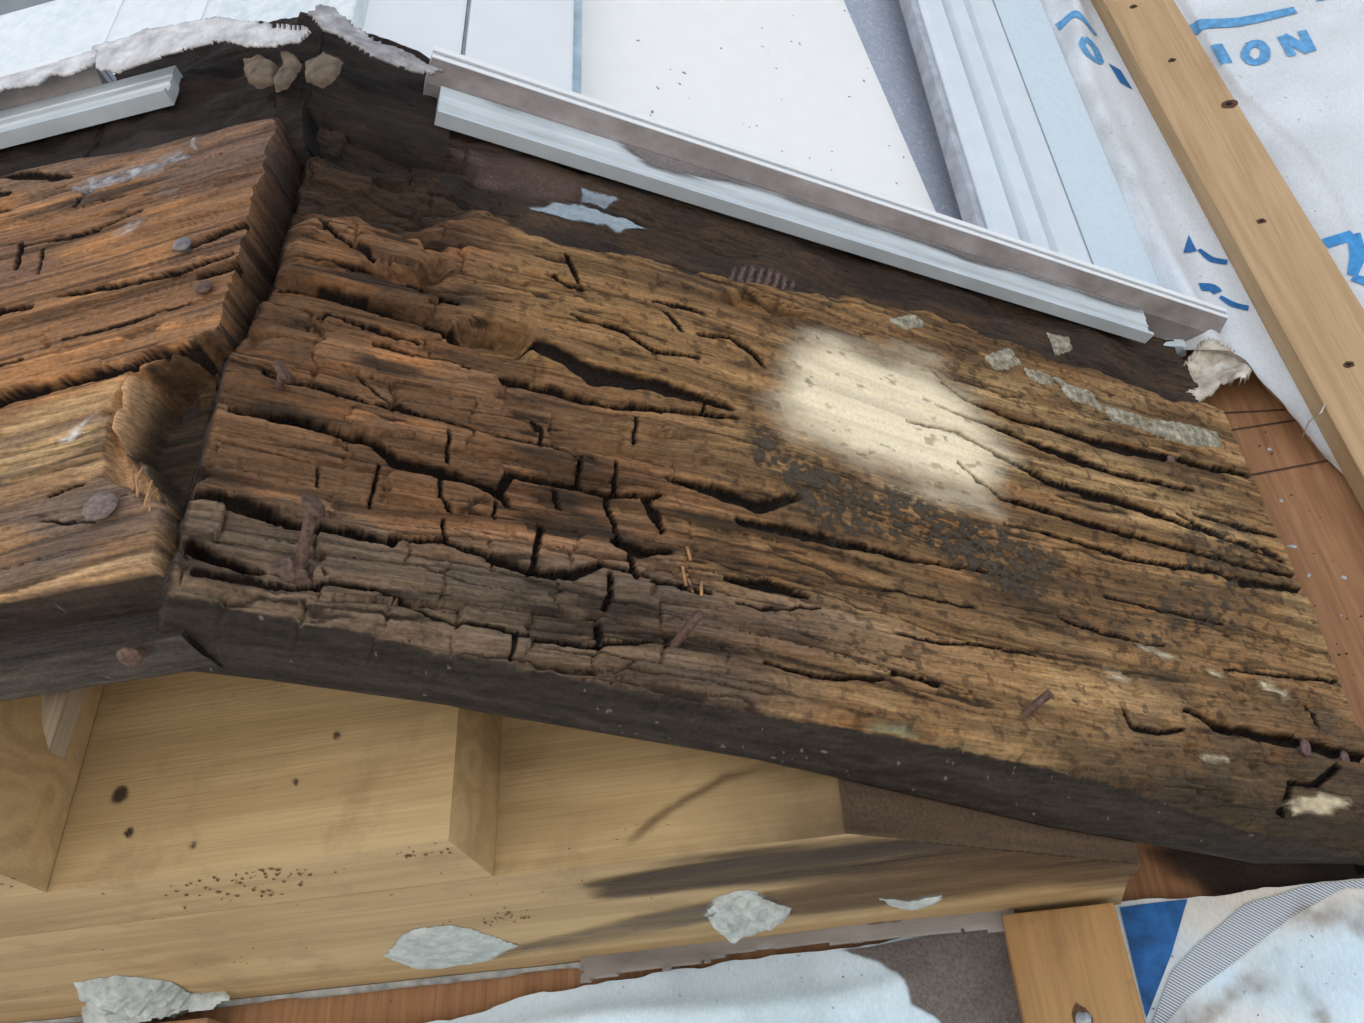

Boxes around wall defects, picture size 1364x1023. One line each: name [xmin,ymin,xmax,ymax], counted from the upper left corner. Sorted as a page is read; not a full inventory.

crack [0,172,142,274]
crack [62,223,249,341]
crack [0,345,219,409]
crack [183,224,985,662]
crack [915,405,1300,593]
crack [763,662,939,688]
crack [897,634,1035,657]
crack [1059,595,1223,647]
crack [1122,669,1364,816]
damp [587,778,1142,916]
damp [1159,847,1364,896]
damp [1292,795,1346,814]